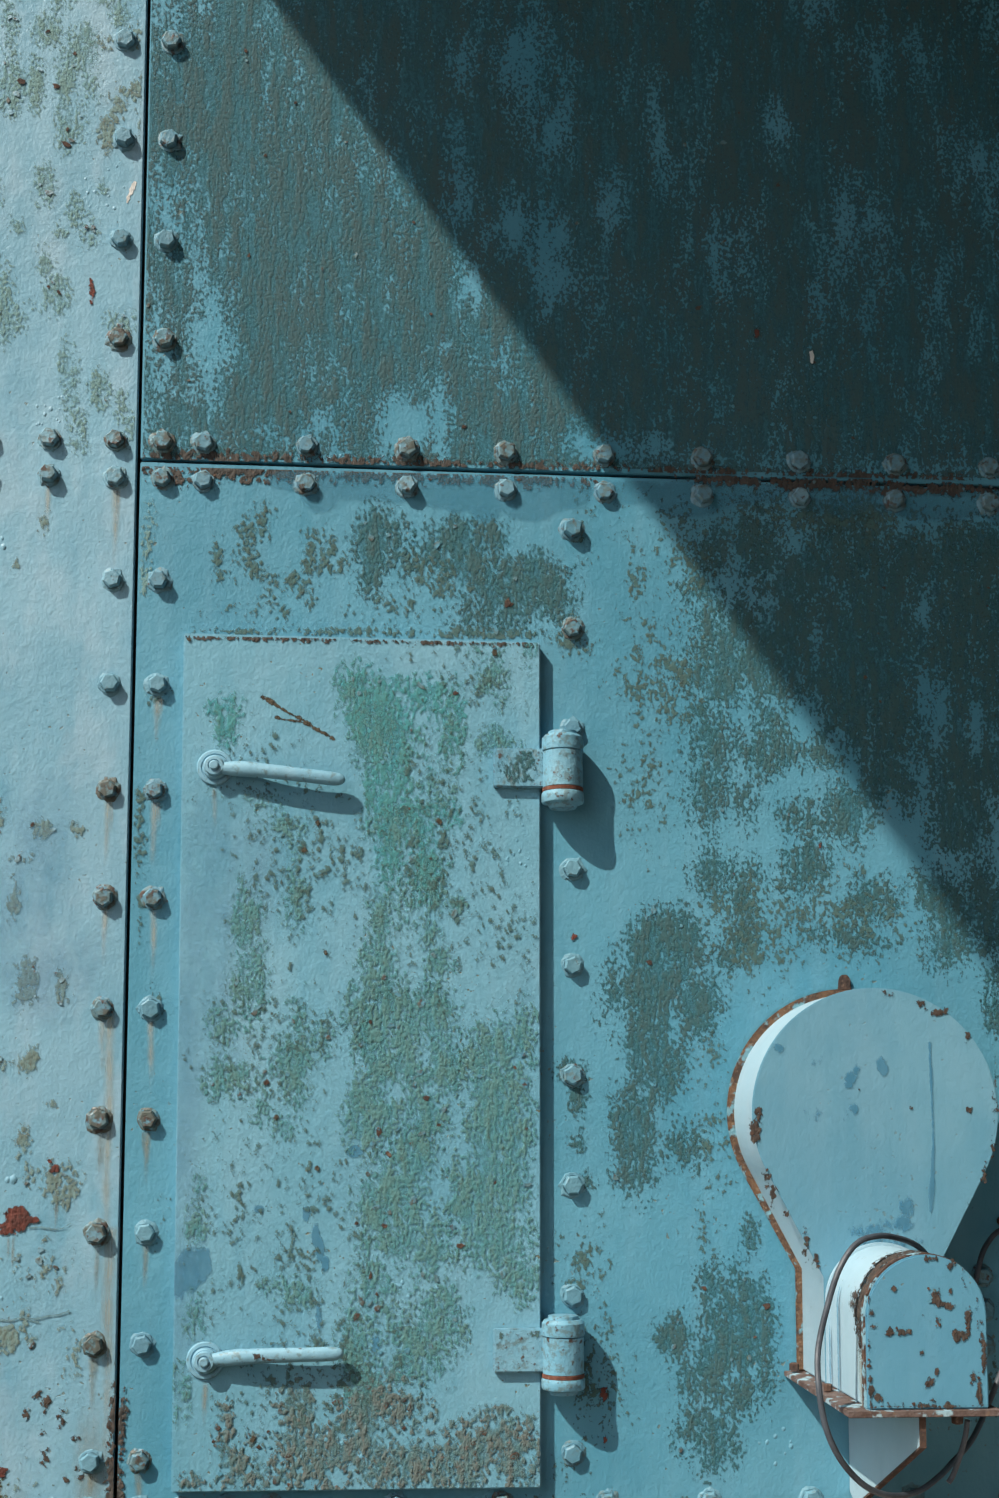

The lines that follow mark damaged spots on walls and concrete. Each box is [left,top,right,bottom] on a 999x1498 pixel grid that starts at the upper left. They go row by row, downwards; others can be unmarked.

peeling [0,0,999,485]
corrosion [141,447,999,498]
peeling [6,819,85,925]
peeling [11,954,74,1015]
corrosion [185,636,537,1450]
peeling [186,482,999,1486]
peeling [14,1123,86,1212]
corrosion [749,1106,763,1144]
corrosion [0,1205,39,1251]
peeling [0,1235,67,1355]
corrosion [850,1249,987,1411]
corrosion [0,1380,139,1498]